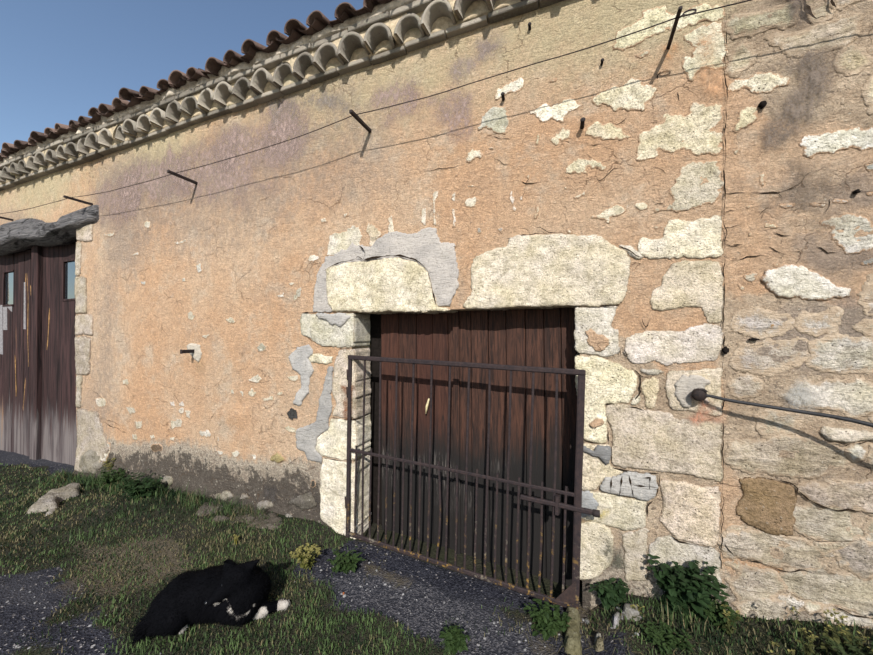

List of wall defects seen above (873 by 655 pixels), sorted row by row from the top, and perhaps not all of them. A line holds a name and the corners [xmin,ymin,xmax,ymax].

flaking render [612,3,729,82]
flaking render [477,76,525,135]
flaking render [728,71,790,94]
flaking render [466,147,493,163]
flaking render [529,77,760,224]
flaking render [308,213,395,262]
crack [723,167,837,261]
peeling [585,329,609,352]